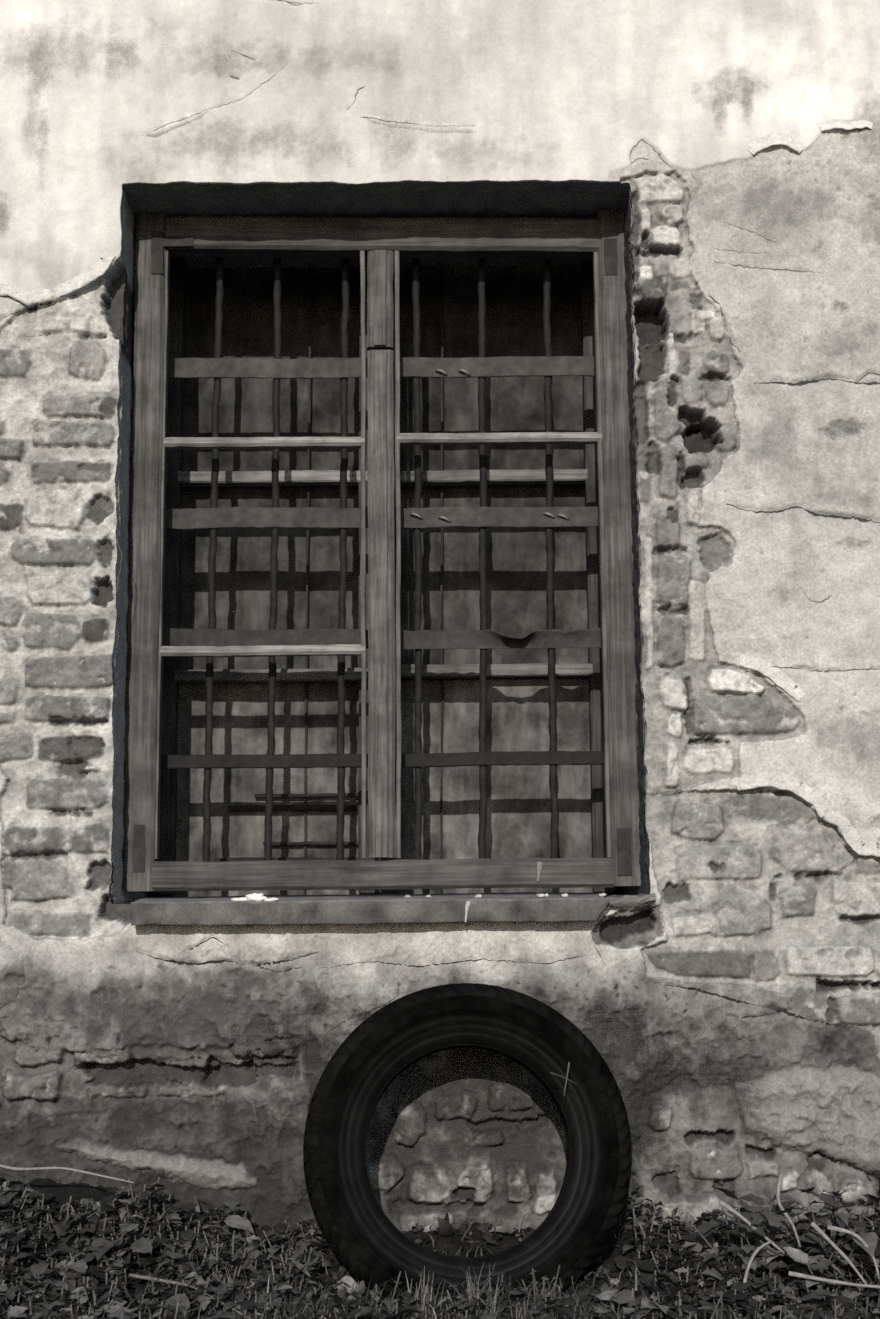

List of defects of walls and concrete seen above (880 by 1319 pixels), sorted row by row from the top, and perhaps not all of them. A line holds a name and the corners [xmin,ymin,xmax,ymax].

peeling [746,133,806,155]
crack [726,503,880,523]
spalling [0,250,131,941]
spalling [592,170,880,1030]
crack [772,665,877,673]
spalling [90,985,118,1002]
spalling [645,1029,689,1048]
spalling [0,1032,311,1131]
spalling [631,1076,880,1223]